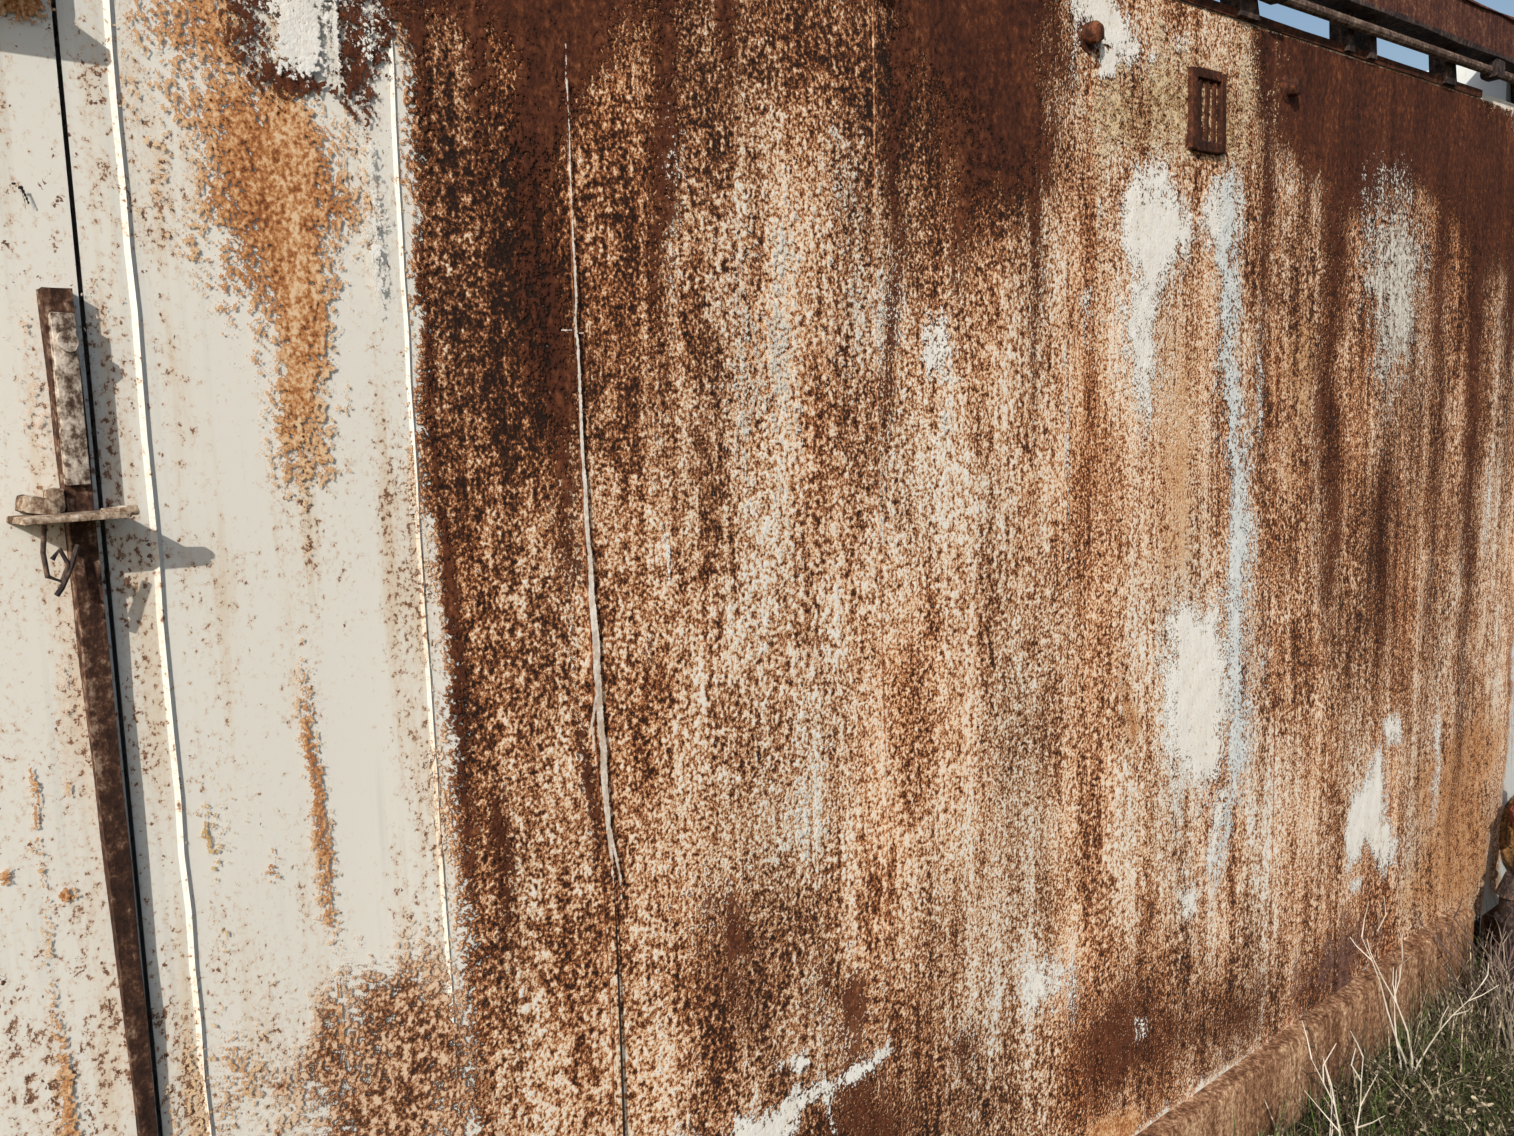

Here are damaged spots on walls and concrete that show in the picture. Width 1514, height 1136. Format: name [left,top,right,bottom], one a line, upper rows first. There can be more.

rust [185,775,263,956]
rust [292,657,345,956]